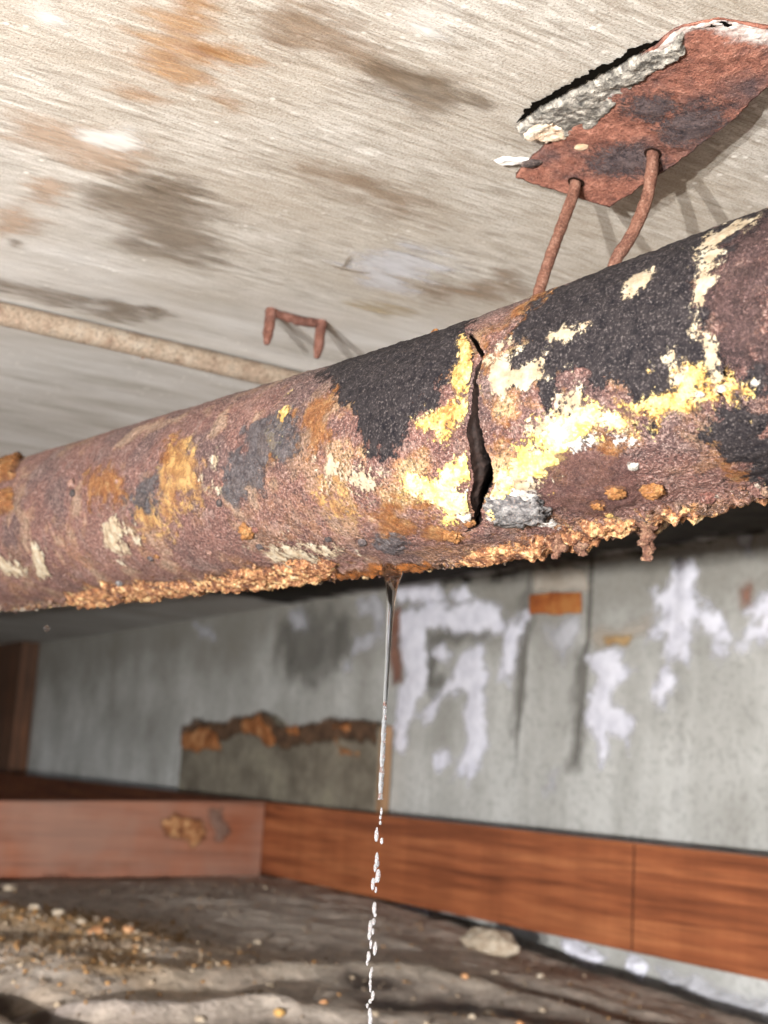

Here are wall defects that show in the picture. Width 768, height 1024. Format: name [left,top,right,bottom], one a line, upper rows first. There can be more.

spalling [515,32,686,150]
damp [27,125,139,170]
spalling [493,156,529,166]
damp [90,174,210,263]
corrosion [480,288,556,375]
corrosion [292,384,339,460]
crack [465,333,494,533]
corrosion [0,451,768,614]
damp [653,501,768,549]
damp [211,532,643,780]
efflorescence [649,558,768,709]
spalling [180,711,377,755]